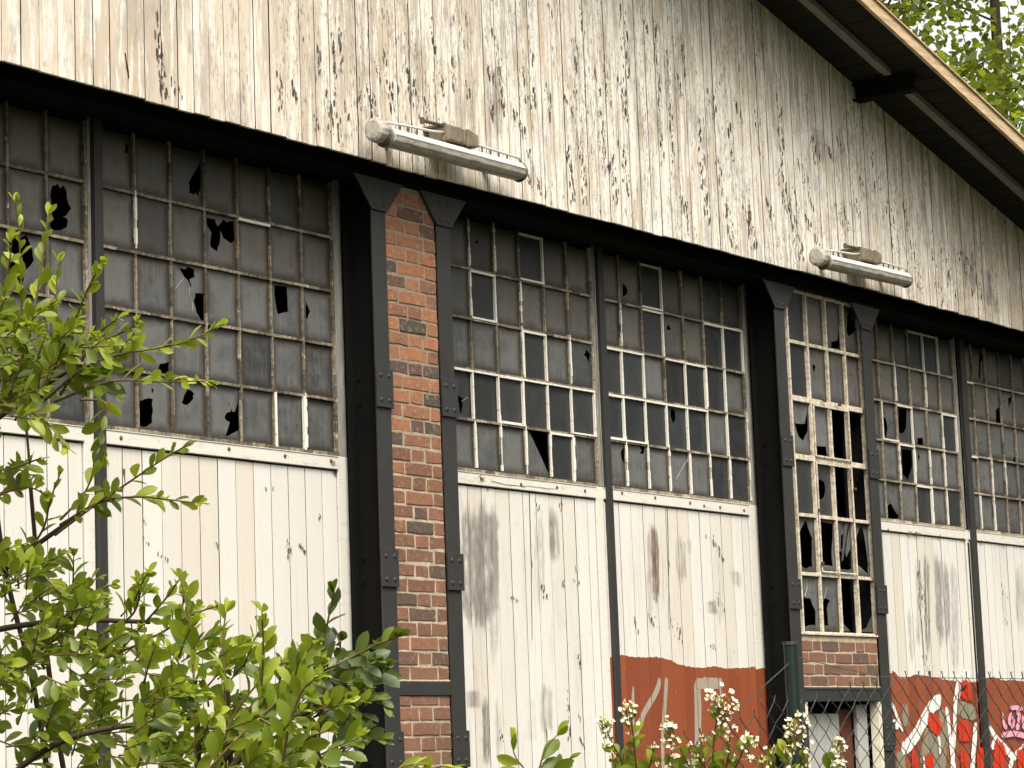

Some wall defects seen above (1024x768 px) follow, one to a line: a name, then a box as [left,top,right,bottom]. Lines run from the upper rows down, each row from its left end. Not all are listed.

peeling [154,10,183,100]
peeling [276,70,298,111]
peeling [314,27,396,152]
peeling [406,67,431,125]
peeling [487,28,551,196]
peeling [566,141,588,206]
peeling [595,3,630,205]
peeling [644,17,687,166]
peeling [681,99,758,251]
peeling [765,93,844,261]
water stain [463,515,497,618]
rust [651,530,659,602]